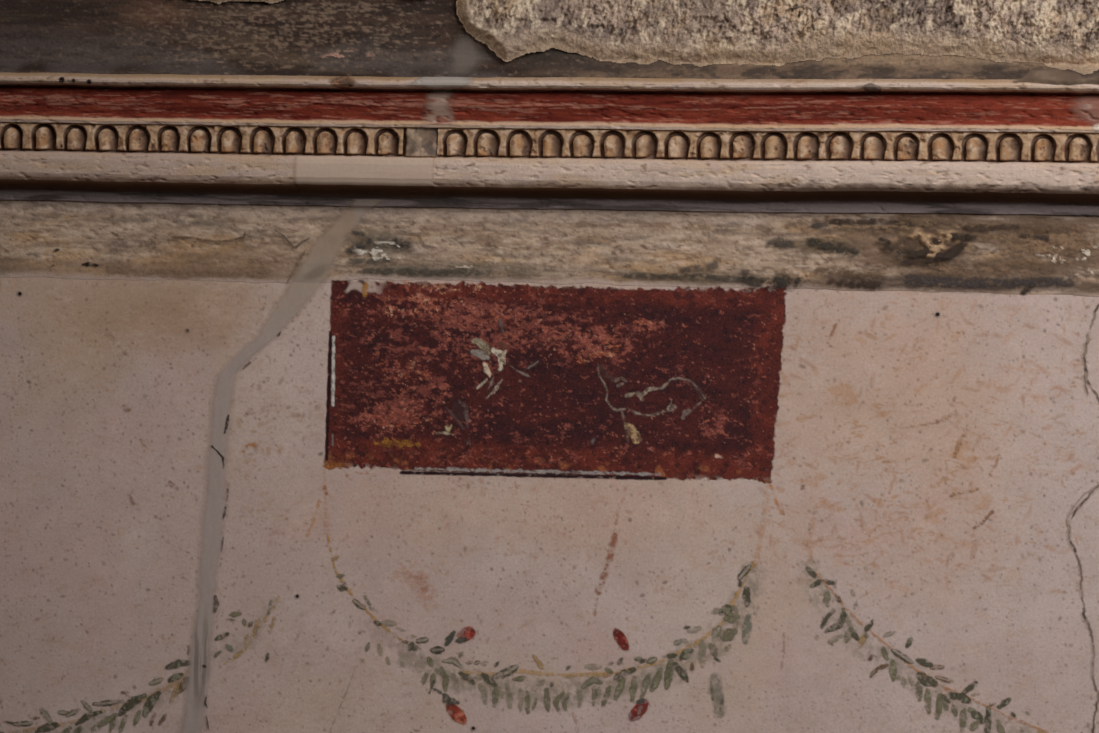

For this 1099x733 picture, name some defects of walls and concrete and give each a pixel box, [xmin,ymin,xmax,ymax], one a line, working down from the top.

spalling [456,0,1099,75]
crack [1082,304,1099,401]
crack [1068,485,1099,733]